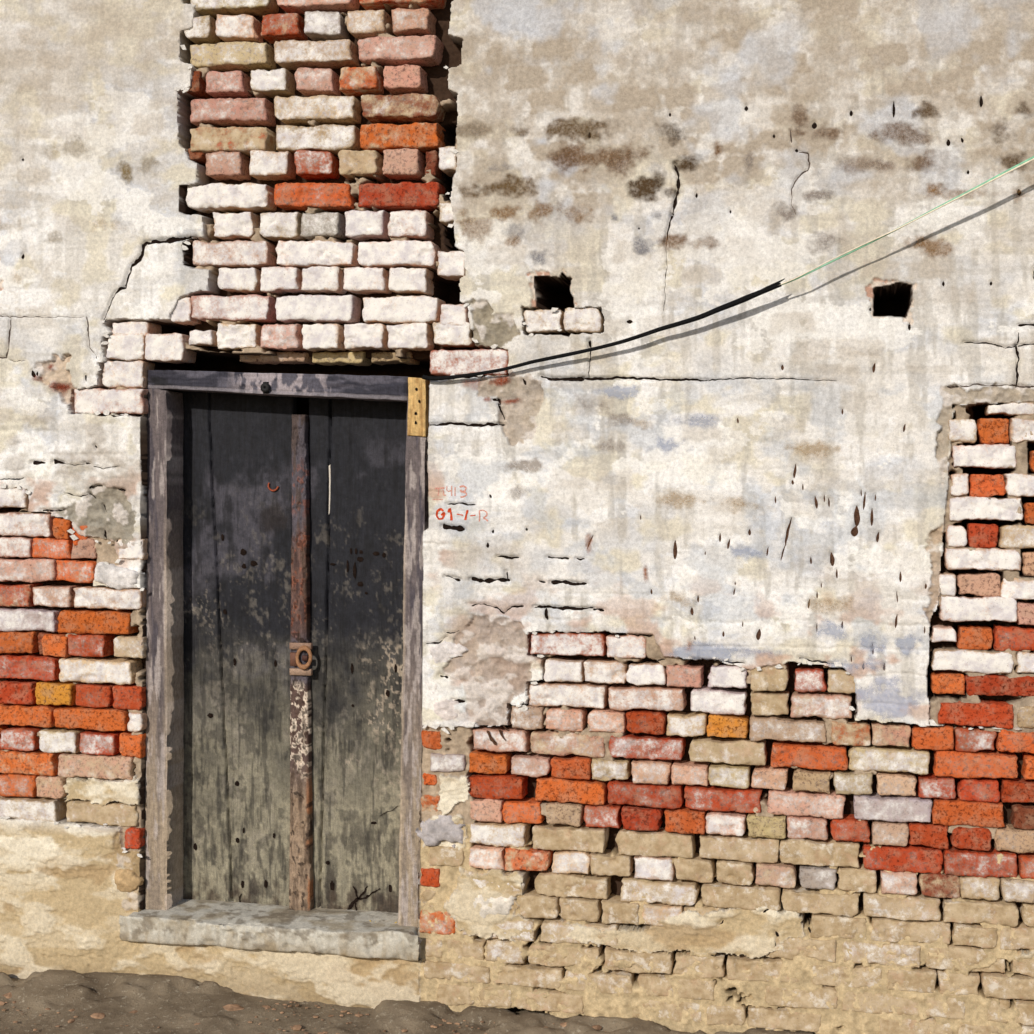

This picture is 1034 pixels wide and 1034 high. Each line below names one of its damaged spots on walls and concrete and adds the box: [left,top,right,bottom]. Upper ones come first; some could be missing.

spalling [68,0,509,417]
water stain [462,174,534,234]
water stain [547,119,676,201]
water stain [674,157,697,170]
water stain [874,103,936,142]
crack [0,236,199,380]
crack [541,340,834,382]
crack [947,324,1034,389]
crack [0,445,126,542]
spalling [851,490,879,542]
spalling [0,483,148,858]
spalling [417,630,1034,1034]